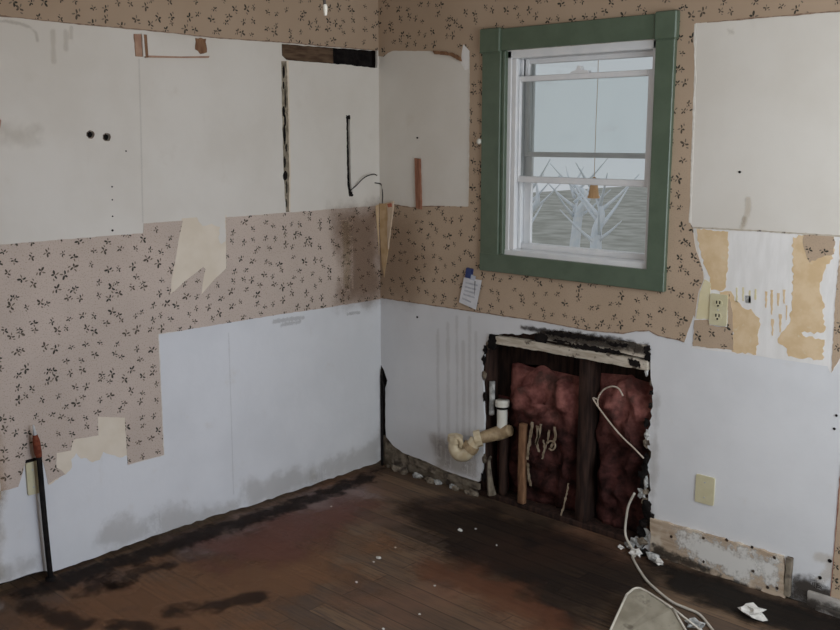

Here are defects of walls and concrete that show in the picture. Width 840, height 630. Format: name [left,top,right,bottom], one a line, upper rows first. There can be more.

peeling [171,213,227,293]
peeling [375,201,394,275]
peeling [692,227,840,373]
flaking render [481,341,489,381]
damp [521,326,648,354]
peeling [49,417,127,485]
flaking render [383,372,487,497]
flaking render [534,331,664,566]
damp [652,543,710,572]
damp [787,575,840,618]